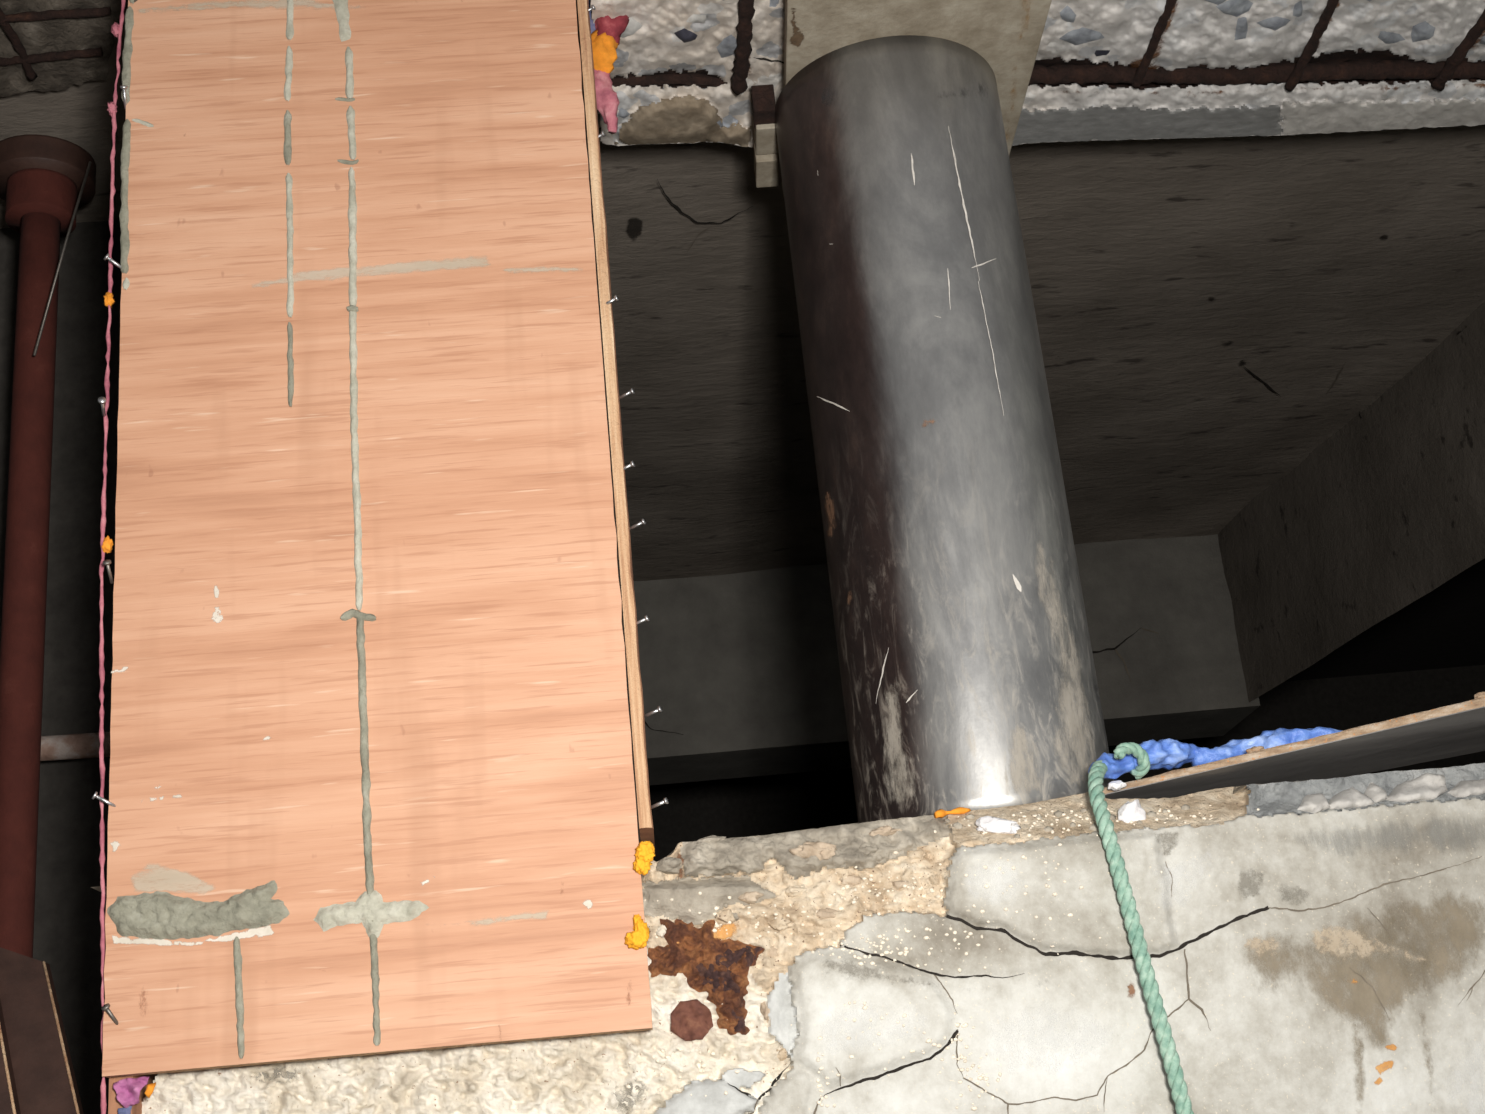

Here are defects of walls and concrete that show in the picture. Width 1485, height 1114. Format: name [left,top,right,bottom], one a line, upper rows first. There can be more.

spalling [591,0,785,148]
spalling [1012,0,1485,146]
crack [657,179,753,252]
corrosion [647,919,765,1035]
spalling [142,763,1485,1114]
crack [813,856,1485,1114]
water stain [1249,894,1479,1096]